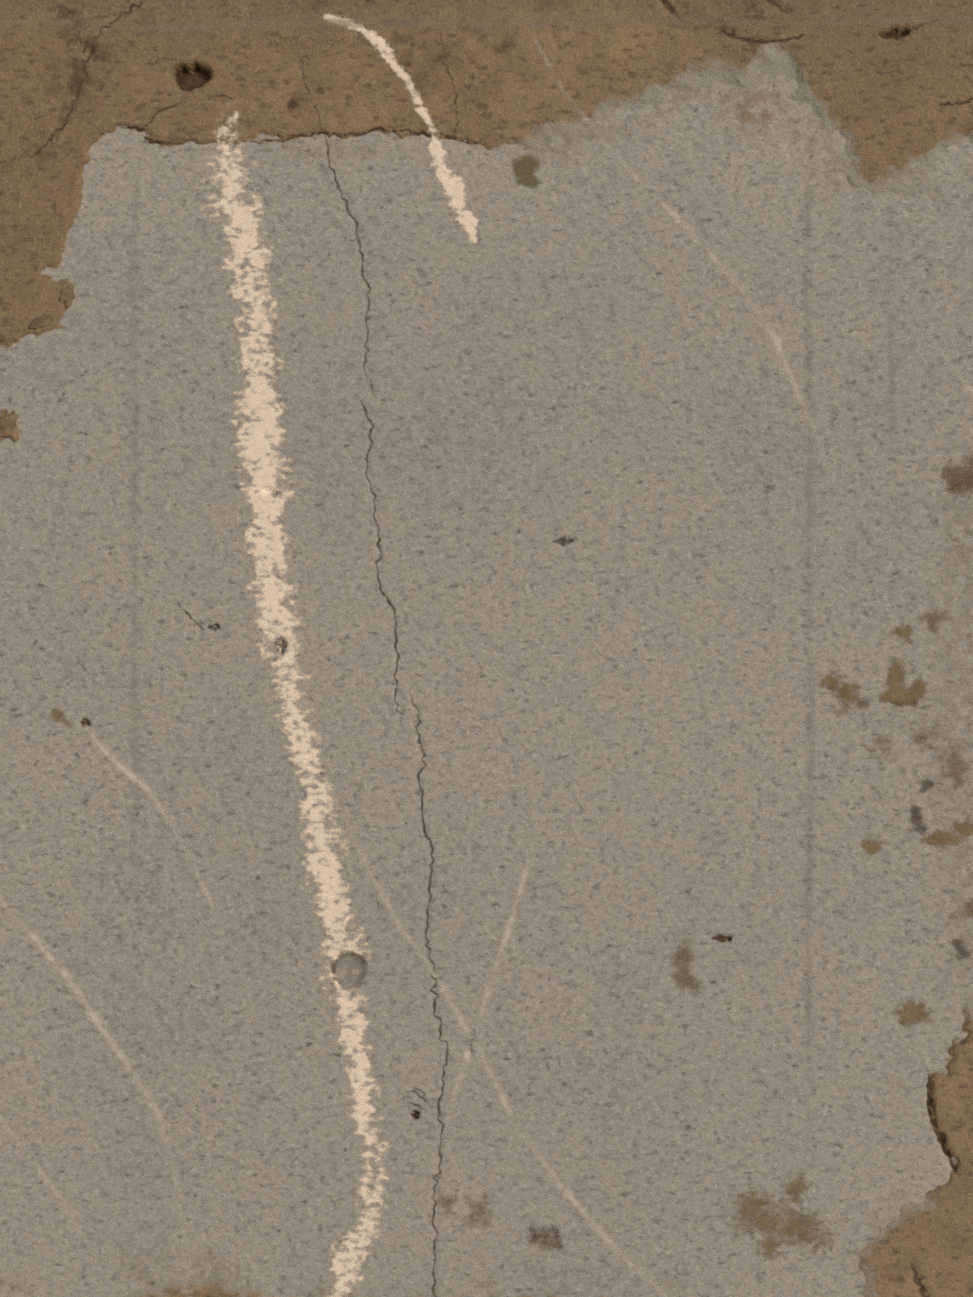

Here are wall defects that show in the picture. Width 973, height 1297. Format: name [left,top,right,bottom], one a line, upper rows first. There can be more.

crack [250,35,485,1297]
crack [926,1074,956,1172]
crack [911,1261,928,1297]